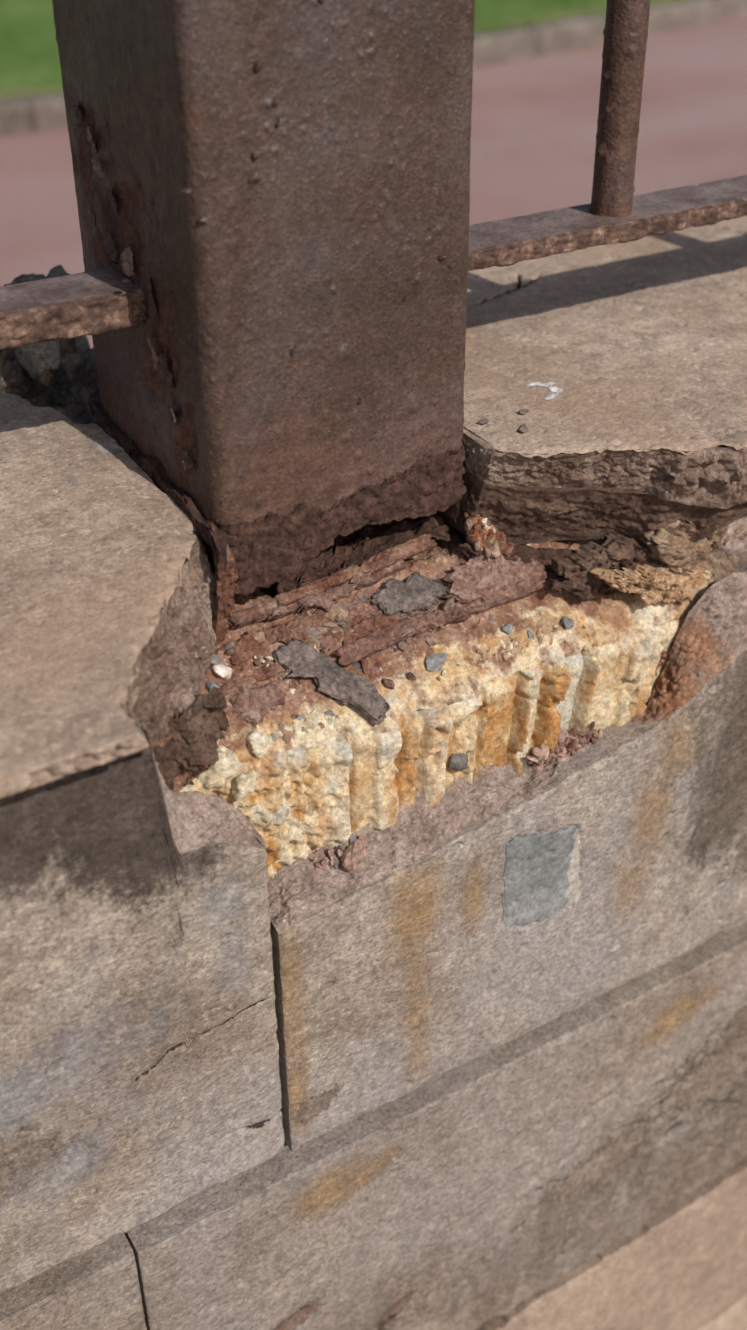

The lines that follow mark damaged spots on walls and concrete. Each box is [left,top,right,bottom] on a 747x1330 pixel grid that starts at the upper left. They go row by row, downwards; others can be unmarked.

peeling [518,409,529,433]
spalling [121,530,266,853]
peeling [293,588,384,675]
rust [208,437,576,728]
peeling [392,634,448,662]
rust [590,596,629,635]
spalling [268,721,603,931]